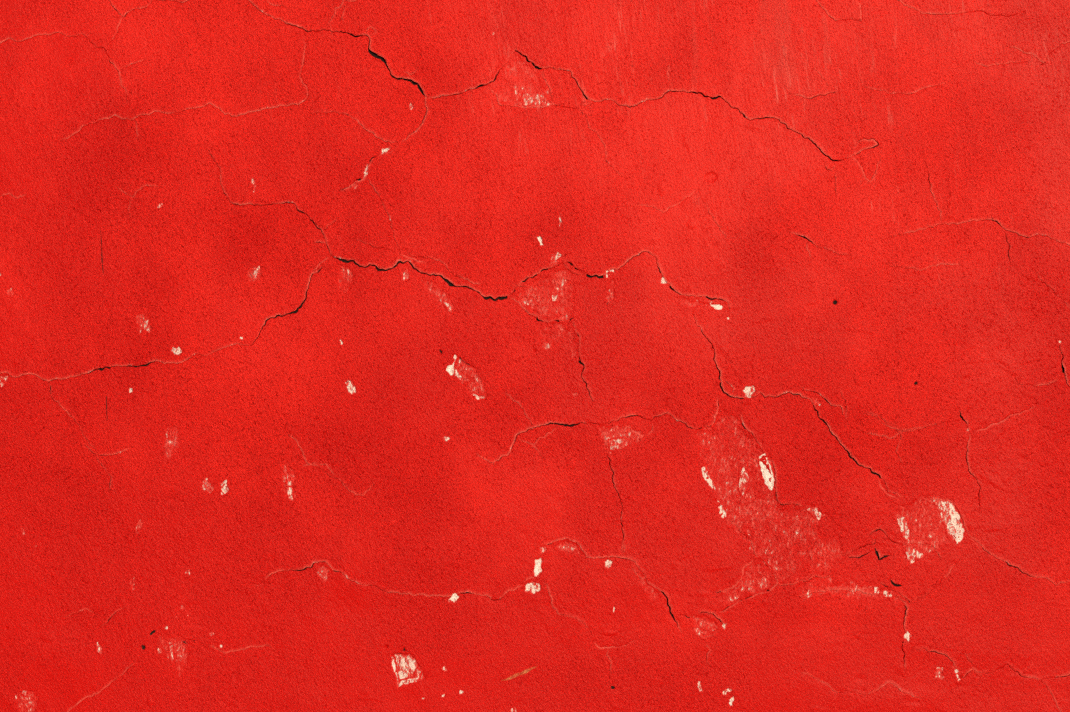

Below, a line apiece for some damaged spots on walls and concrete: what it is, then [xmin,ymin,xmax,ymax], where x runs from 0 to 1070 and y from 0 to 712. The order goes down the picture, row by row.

crack [0,0,882,498]
crack [879,160,1070,312]
peeling [440,350,490,403]
peeling [741,383,759,399]
crack [473,311,1070,712]
peeling [693,407,903,606]
peeling [893,494,970,573]
crack [66,661,139,712]
crack [206,642,278,656]
peeling [385,645,468,702]
crack [246,558,636,686]